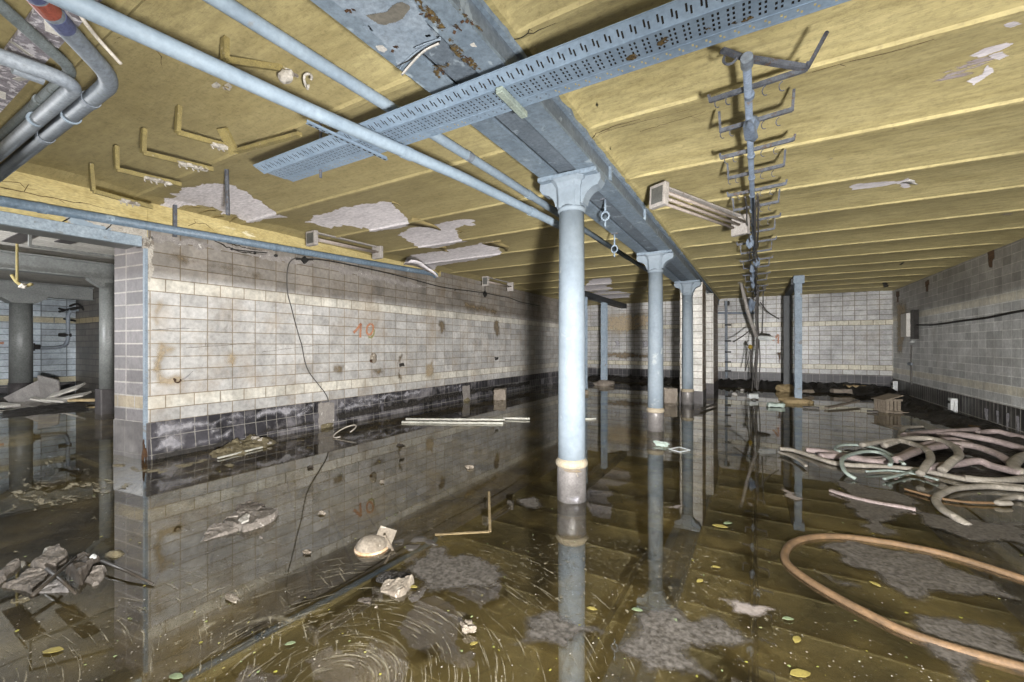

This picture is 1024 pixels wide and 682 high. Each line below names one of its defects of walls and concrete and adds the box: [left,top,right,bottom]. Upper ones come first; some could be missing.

corrosion [415,0,483,78]
peeling [937,43,1013,85]
peeling [160,183,287,223]
peeling [850,178,918,190]
peeling [305,201,509,278]